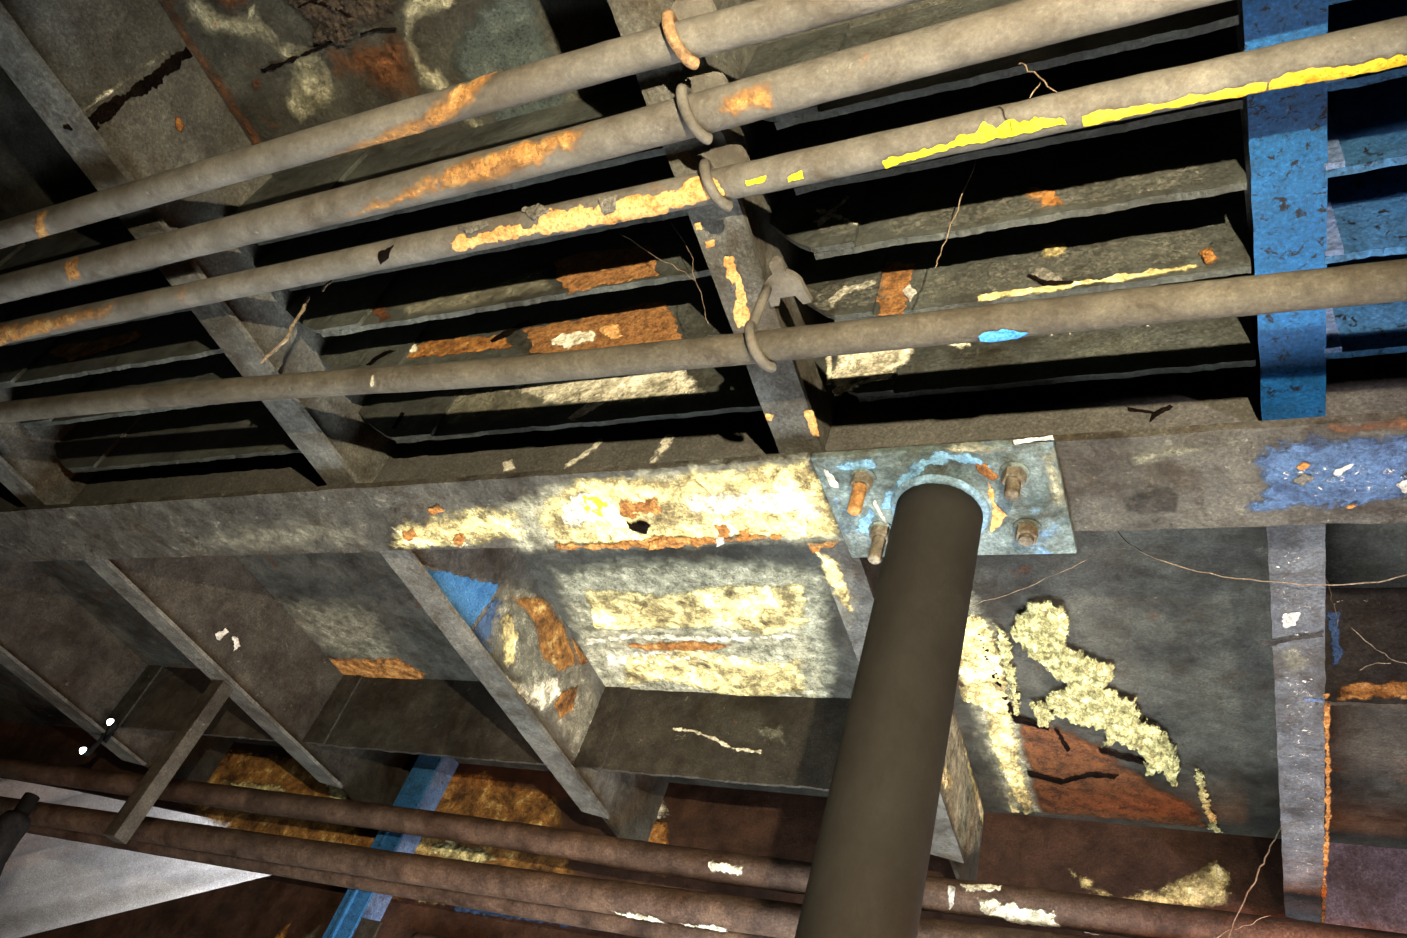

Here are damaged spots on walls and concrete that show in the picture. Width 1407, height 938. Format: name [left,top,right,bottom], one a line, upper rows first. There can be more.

crack [260,0,397,73]
corrosion [371,131,576,208]
corrosion [407,300,682,358]
water stain [394,433,838,549]
corrosion [975,463,1007,534]
peeling [1244,435,1407,511]
water stain [559,561,830,698]
water stain [941,766,953,789]
water stain [962,739,984,825]
corrosion [1320,681,1407,923]